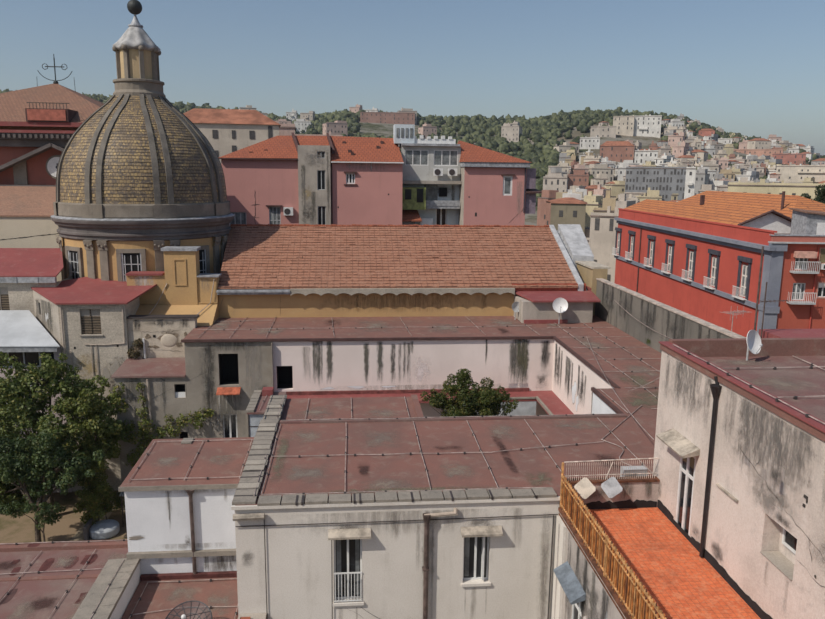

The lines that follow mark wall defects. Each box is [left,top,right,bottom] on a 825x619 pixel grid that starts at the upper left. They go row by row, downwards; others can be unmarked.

leakage [204,342,247,425]
leakage [313,341,332,373]
leakage [364,341,413,375]
leakage [510,339,528,375]
leakage [542,341,596,411]
leakage [742,401,801,479]
leakage [758,484,788,526]
leakage [569,546,608,619]